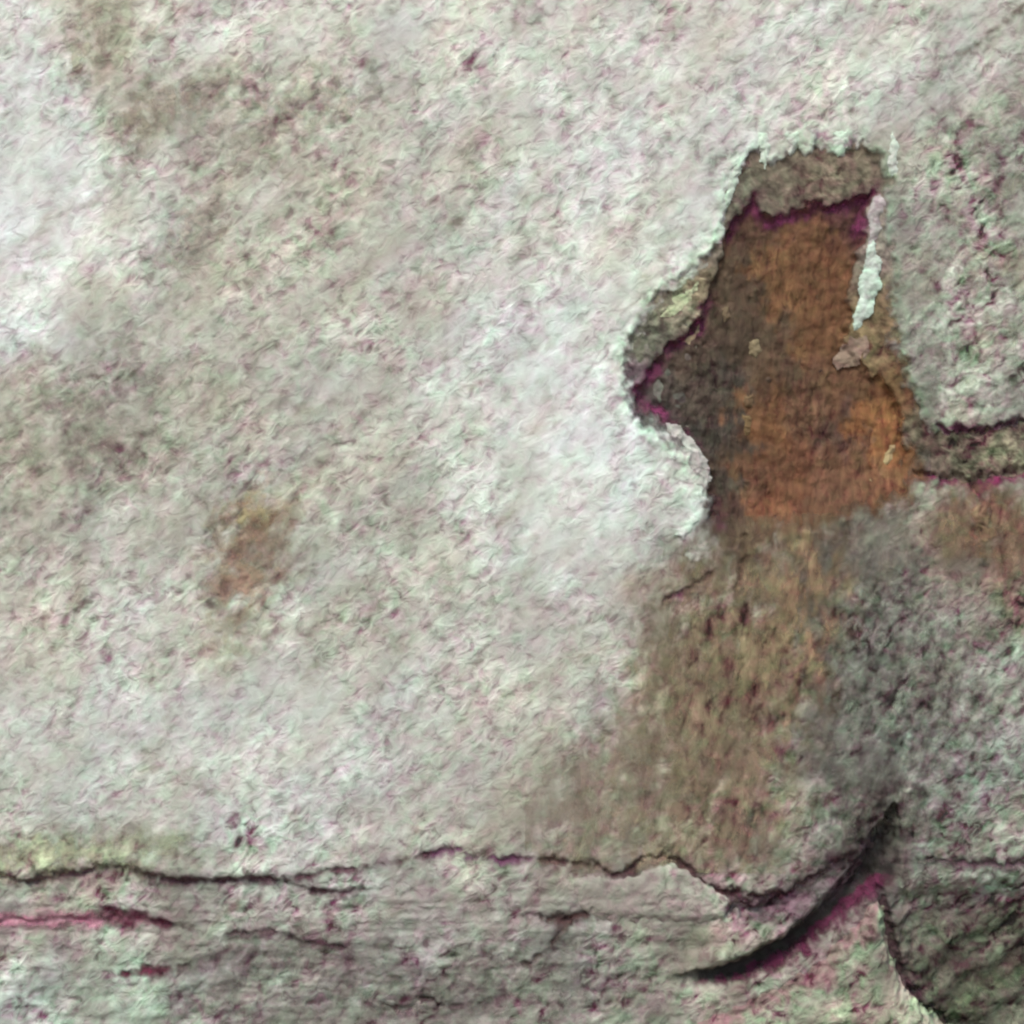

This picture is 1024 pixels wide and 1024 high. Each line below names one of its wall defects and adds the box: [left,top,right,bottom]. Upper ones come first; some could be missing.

flaking render [623,127,1024,565]
water stain [729,560,981,923]
crack [0,862,366,896]
crack [983,894,1024,916]
crack [0,907,173,929]
crack [399,824,960,1023]
crack [227,927,346,952]
crack [120,964,188,977]
crack [952,953,977,973]
crack [377,995,484,1014]